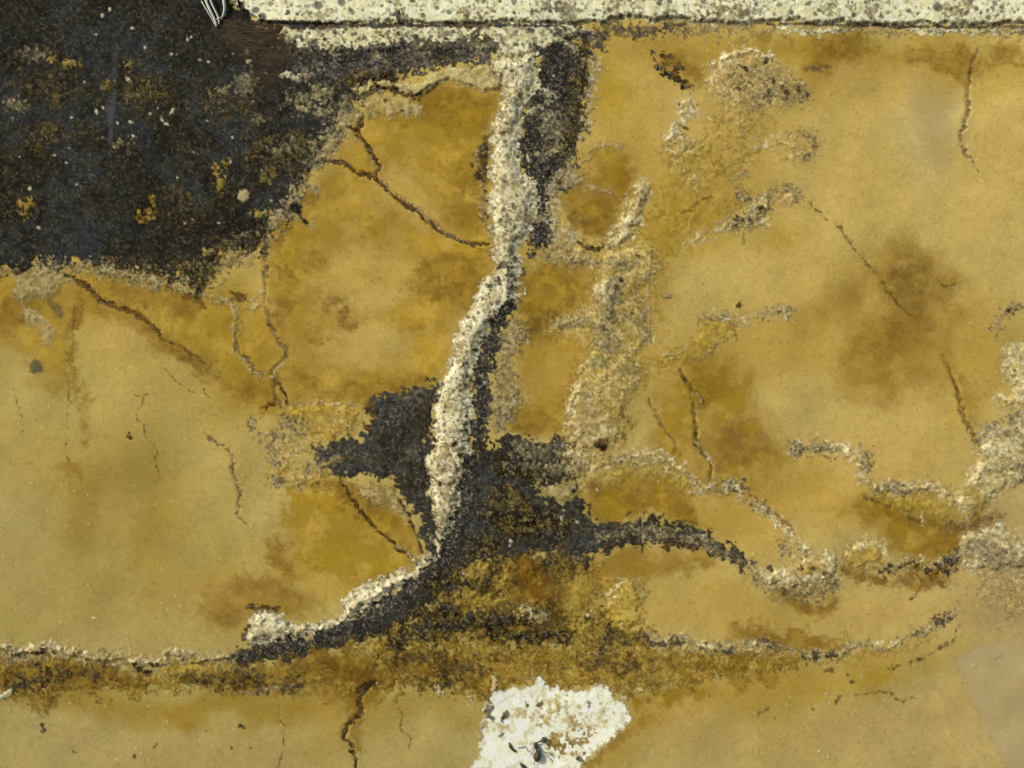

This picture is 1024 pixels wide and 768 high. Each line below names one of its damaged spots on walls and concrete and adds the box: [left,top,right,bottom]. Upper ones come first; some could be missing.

leakage [650,44,820,191]
crack [324,114,490,250]
leakage [712,182,806,235]
crack [64,274,206,390]
crack [231,310,289,409]
leakage [0,0,783,676]
crack [648,369,712,469]
crack [341,482,423,569]
leakage [759,341,1024,617]
leakage [638,600,962,671]
crack [342,679,377,768]
spalling [471,676,631,768]